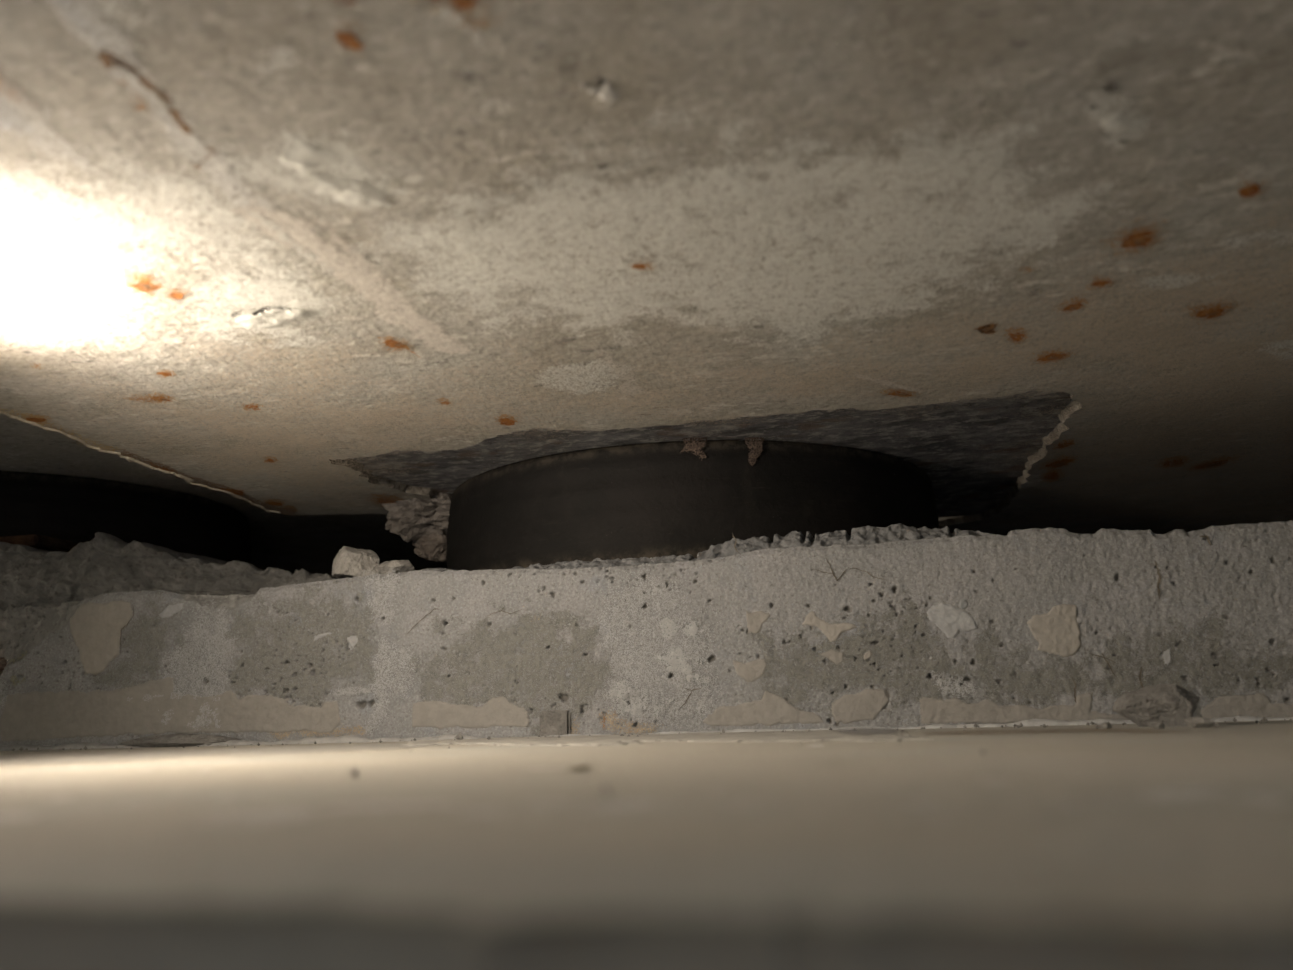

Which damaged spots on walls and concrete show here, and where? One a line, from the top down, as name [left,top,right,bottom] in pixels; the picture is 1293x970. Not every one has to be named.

rust [324,19,365,55]
rust [94,50,193,135]
rust [124,273,194,300]
rust [974,320,1076,365]